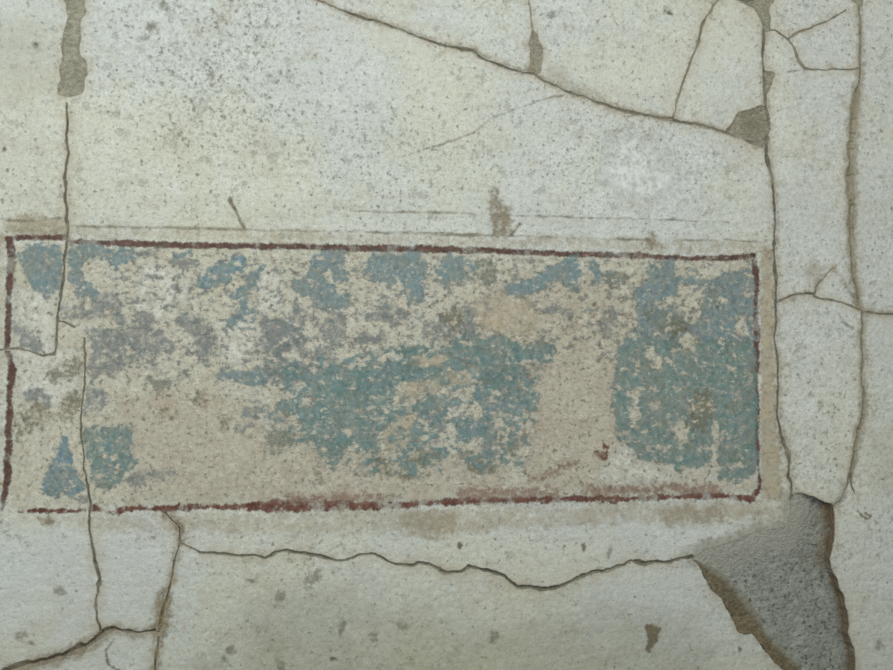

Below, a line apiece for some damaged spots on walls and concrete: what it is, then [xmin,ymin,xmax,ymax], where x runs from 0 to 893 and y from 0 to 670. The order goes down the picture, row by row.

crack [0,102,693,670]
crack [315,0,893,507]
spalling [686,492,855,670]